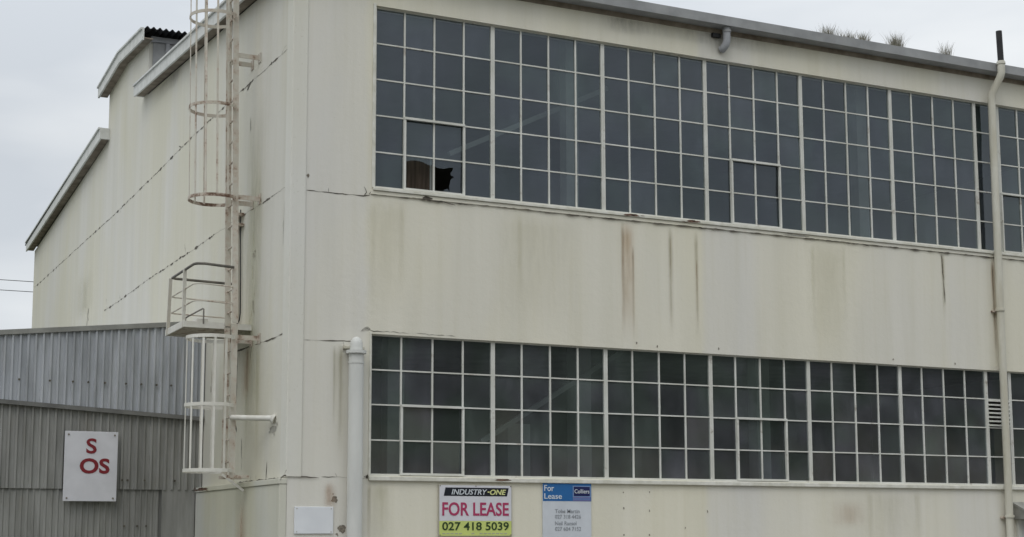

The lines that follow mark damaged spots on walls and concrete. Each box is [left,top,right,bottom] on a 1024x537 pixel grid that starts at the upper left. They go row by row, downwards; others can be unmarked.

crack [87,187,1024,321]